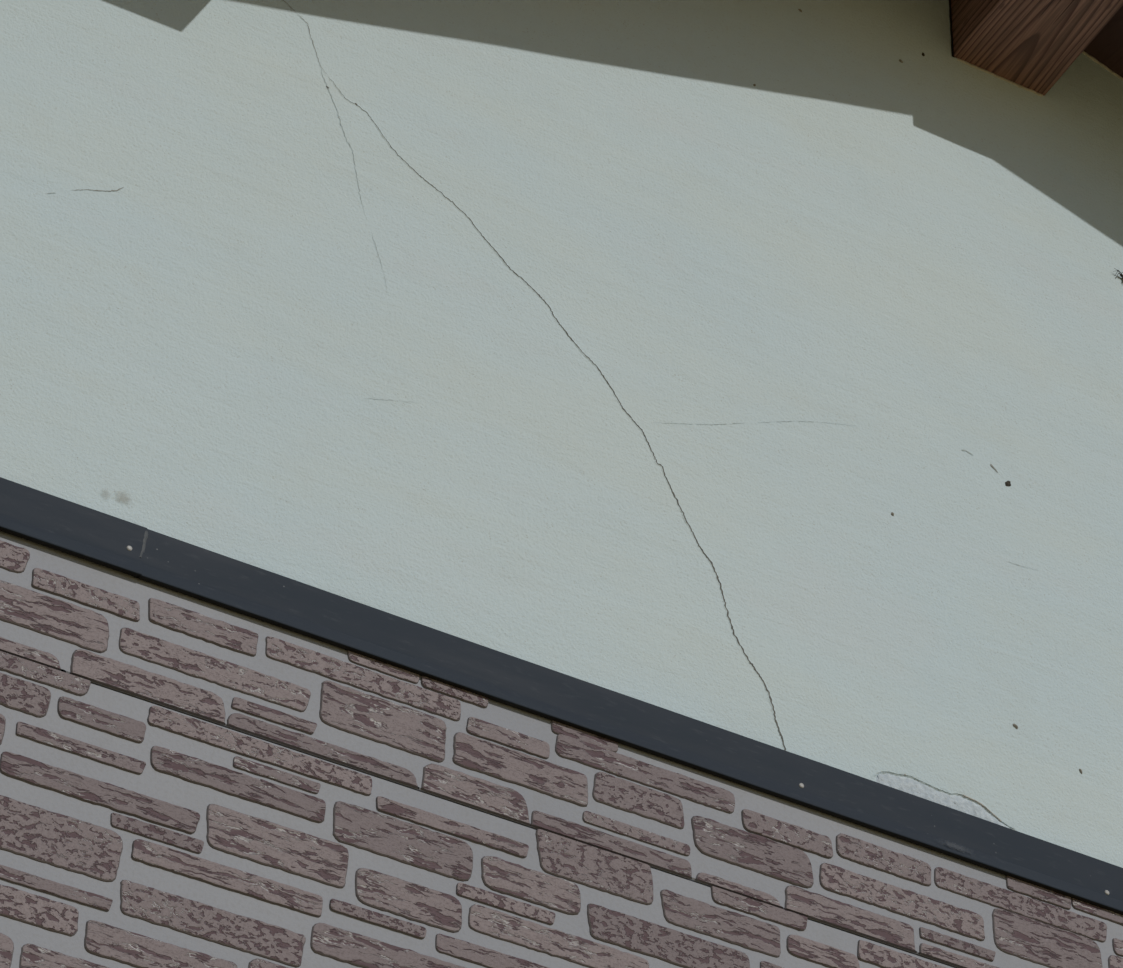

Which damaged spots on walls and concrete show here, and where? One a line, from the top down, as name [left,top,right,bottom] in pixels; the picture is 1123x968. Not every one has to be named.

crack [283,0,856,751]
spalling [872,769,1014,829]